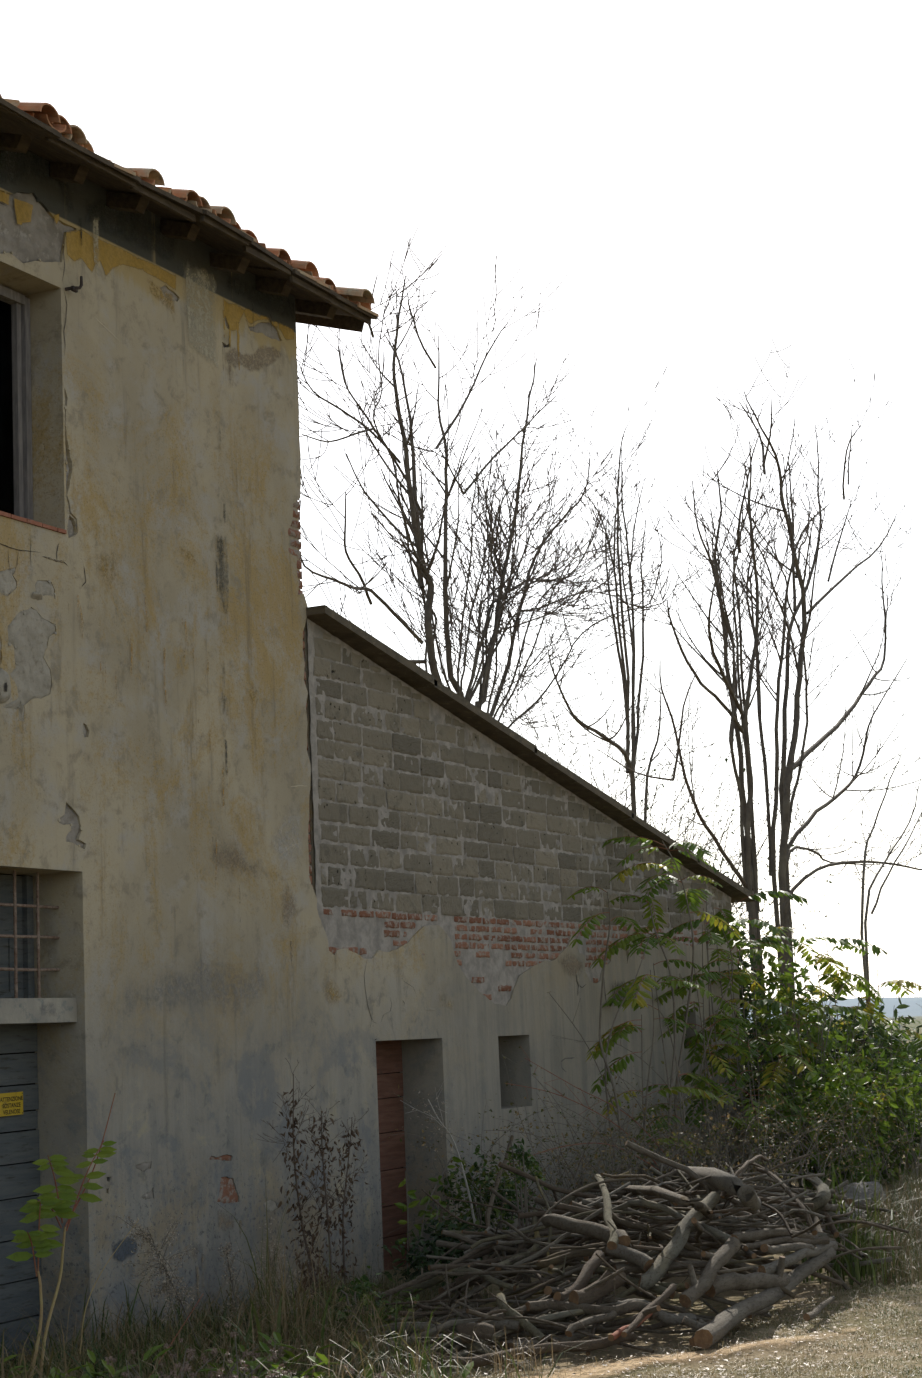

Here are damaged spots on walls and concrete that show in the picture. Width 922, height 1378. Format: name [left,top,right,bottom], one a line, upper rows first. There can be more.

flaking render [0,191,178,301]
peeling [222,300,294,370]
flaking render [58,805,84,848]
flaking render [210,1154,238,1204]